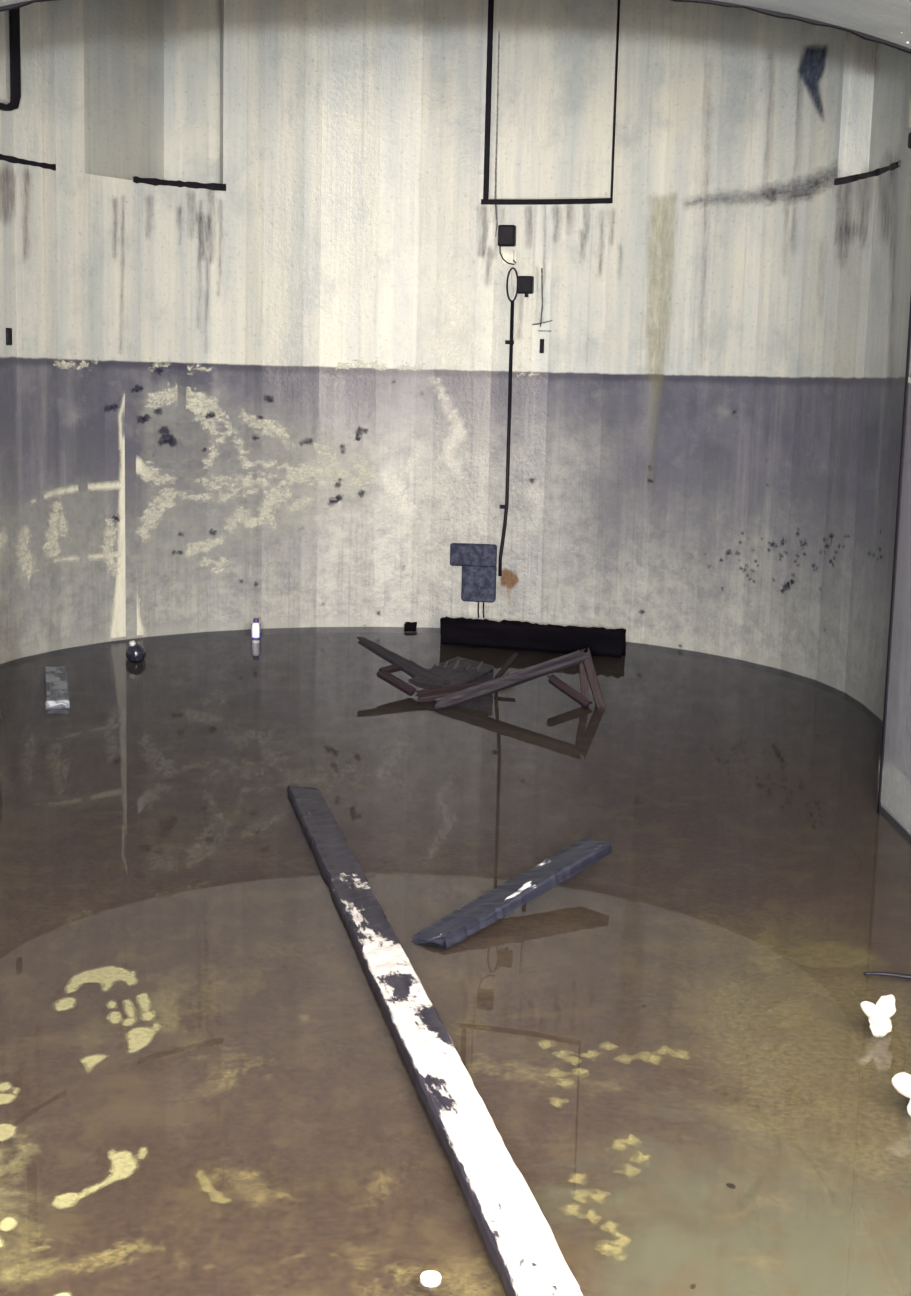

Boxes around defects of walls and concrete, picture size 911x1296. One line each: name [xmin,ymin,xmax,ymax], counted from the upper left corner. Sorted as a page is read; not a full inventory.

peeling [136,365,376,574]
peeling [0,499,67,582]
peeling [102,519,119,576]
corrosion [501,570,518,587]